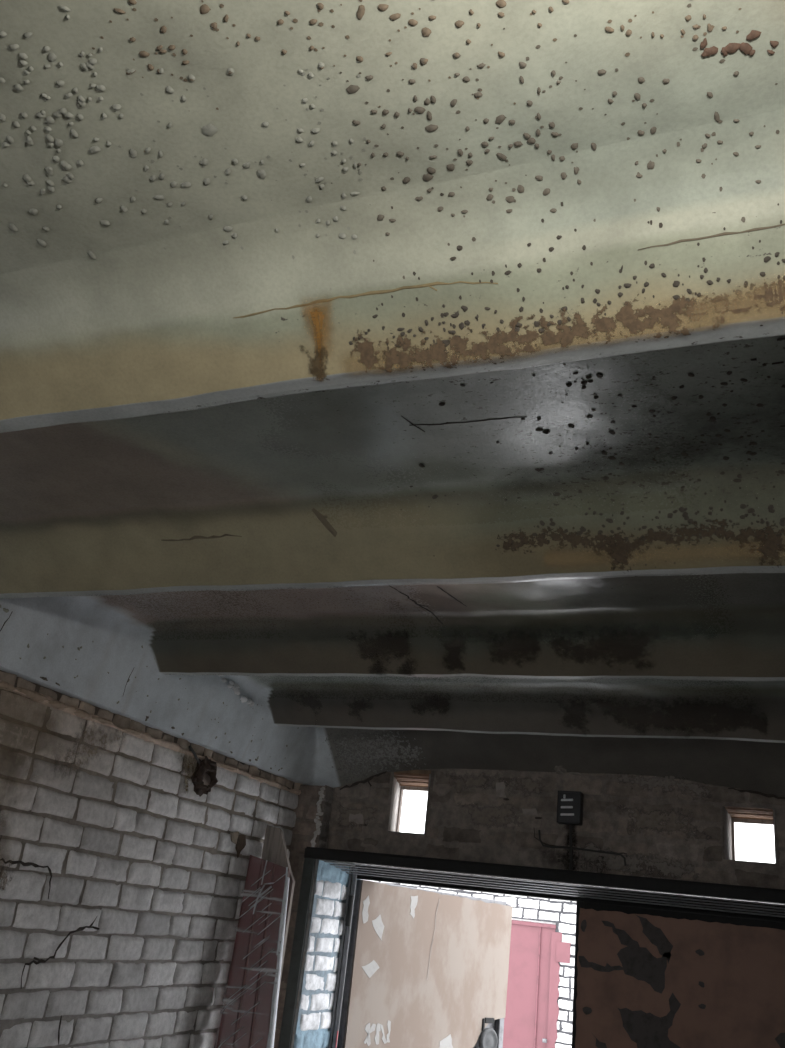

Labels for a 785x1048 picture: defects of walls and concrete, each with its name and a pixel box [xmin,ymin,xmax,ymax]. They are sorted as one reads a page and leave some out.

peeling [126,17,209,111]
peeling [200,0,260,46]
peeling [378,4,436,66]
peeling [277,3,419,254]
peeling [365,58,586,217]
peeling [118,140,277,227]
crack [638,224,785,250]
corrosion [302,307,328,381]
corrosion [350,280,785,373]
crack [402,416,518,432]
corrosion [497,518,785,571]
crack [21,917,100,988]